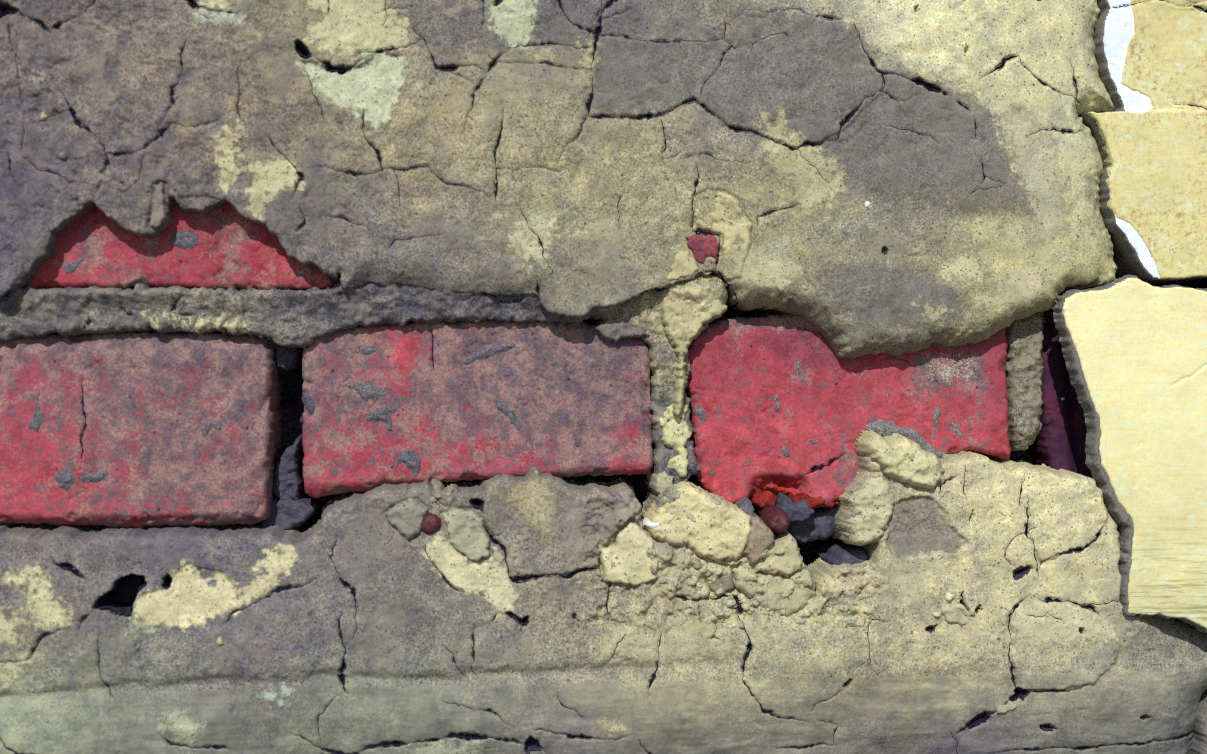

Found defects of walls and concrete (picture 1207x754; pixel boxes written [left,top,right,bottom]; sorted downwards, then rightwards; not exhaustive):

crack [0,0,244,201]
crack [269,0,1005,310]
crack [979,55,1083,137]
peeling [1103,0,1153,113]
peeling [1114,213,1160,279]
spalling [749,489,840,510]
crack [51,558,89,582]
crack [227,521,651,754]
crack [648,629,662,693]
crack [675,594,842,749]
crack [951,474,1119,754]
crack [994,731,1193,754]